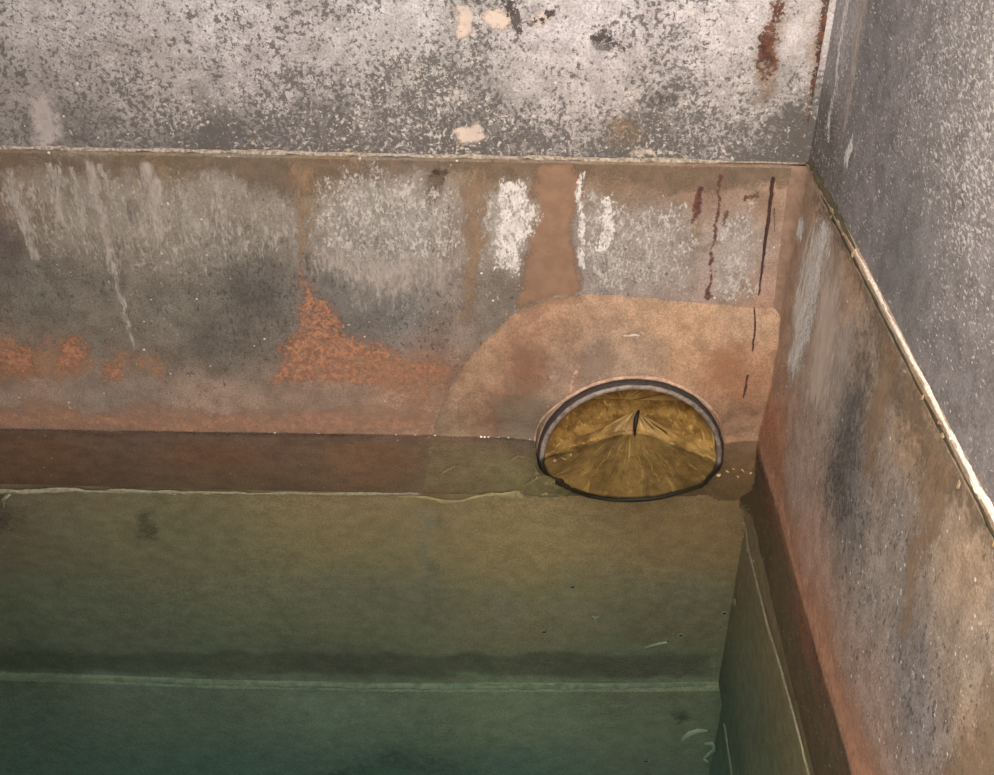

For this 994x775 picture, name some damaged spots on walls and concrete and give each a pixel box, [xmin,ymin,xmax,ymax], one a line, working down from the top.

spalling [455,0,556,39]
spalling [590,28,626,52]
rust [755,0,785,81]
rust [804,0,830,125]
damp [0,86,556,349]
damp [573,164,791,306]
rust [691,186,704,224]
rust [704,174,728,300]
rust [0,330,170,387]
rust [265,258,455,431]